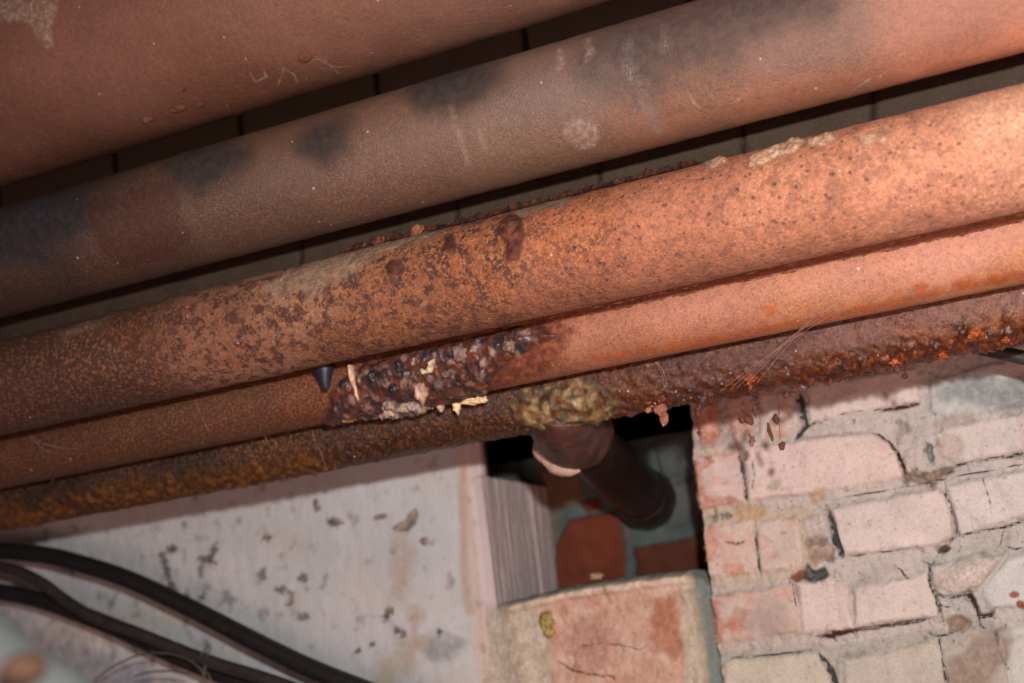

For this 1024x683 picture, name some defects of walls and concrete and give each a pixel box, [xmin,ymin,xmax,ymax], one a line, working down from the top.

corrosion [338,158,702,260]
efflorescence [266,231,436,296]
corrosion [386,260,404,275]
corrosion [487,214,1024,389]
peeling [509,377,618,431]
corrosion [645,311,1024,451]